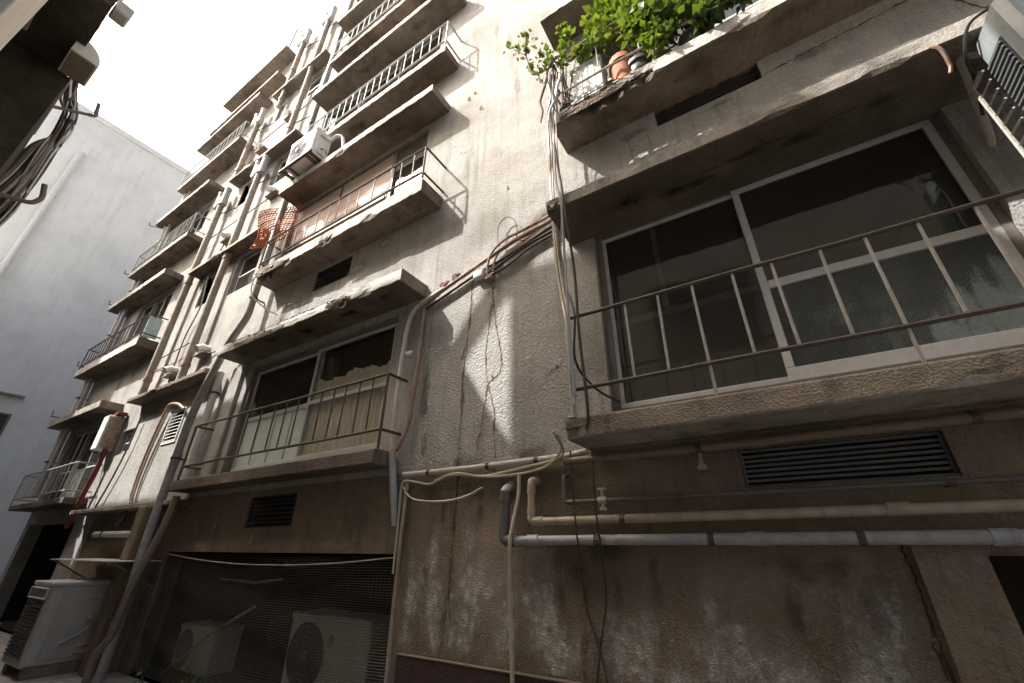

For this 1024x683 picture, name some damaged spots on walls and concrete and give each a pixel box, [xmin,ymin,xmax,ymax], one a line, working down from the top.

crack [441,283,503,638]
crack [900,545,957,683]